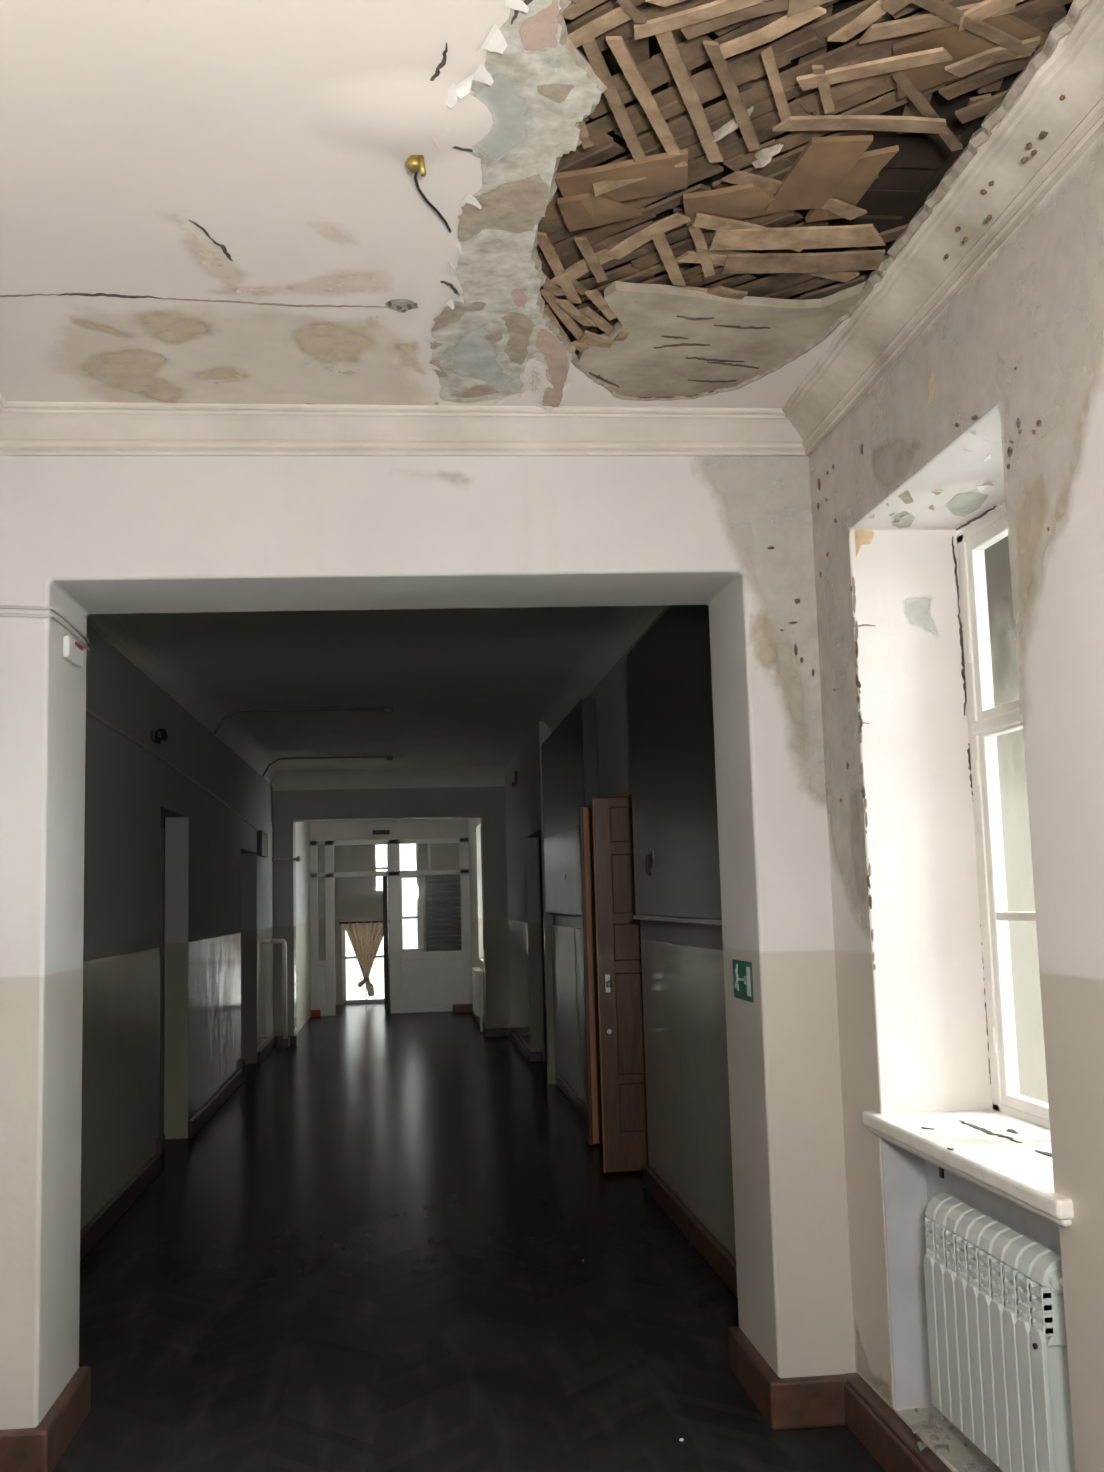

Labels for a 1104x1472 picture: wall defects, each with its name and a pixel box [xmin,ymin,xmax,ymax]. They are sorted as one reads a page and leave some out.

crack [189,220,233,261]
spalling [425,0,1093,412]
crack [0,293,387,308]
spalling [385,299,419,313]
spalling [955,415,1042,470]
spalling [817,465,838,523]
peeling [854,484,993,556]
spalling [780,598,815,677]
spalling [850,576,863,743]
spalling [846,762,868,839]